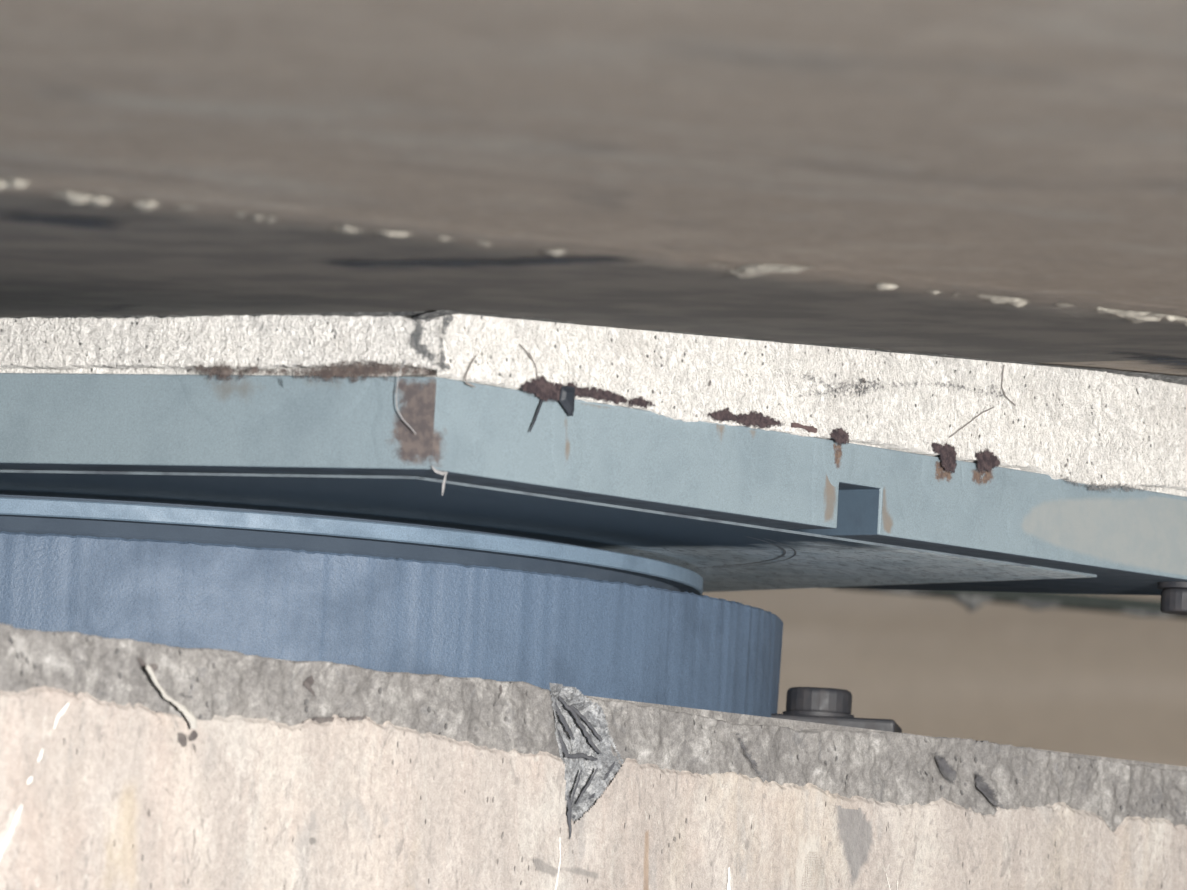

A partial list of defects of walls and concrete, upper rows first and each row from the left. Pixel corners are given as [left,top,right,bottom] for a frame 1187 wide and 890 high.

corrosion [179,362,459,469]
corrosion [521,376,655,481]
corrosion [701,407,855,525]
corrosion [921,442,1006,519]
crack [0,703,69,890]
spalling [549,683,623,839]
crack [546,816,574,890]